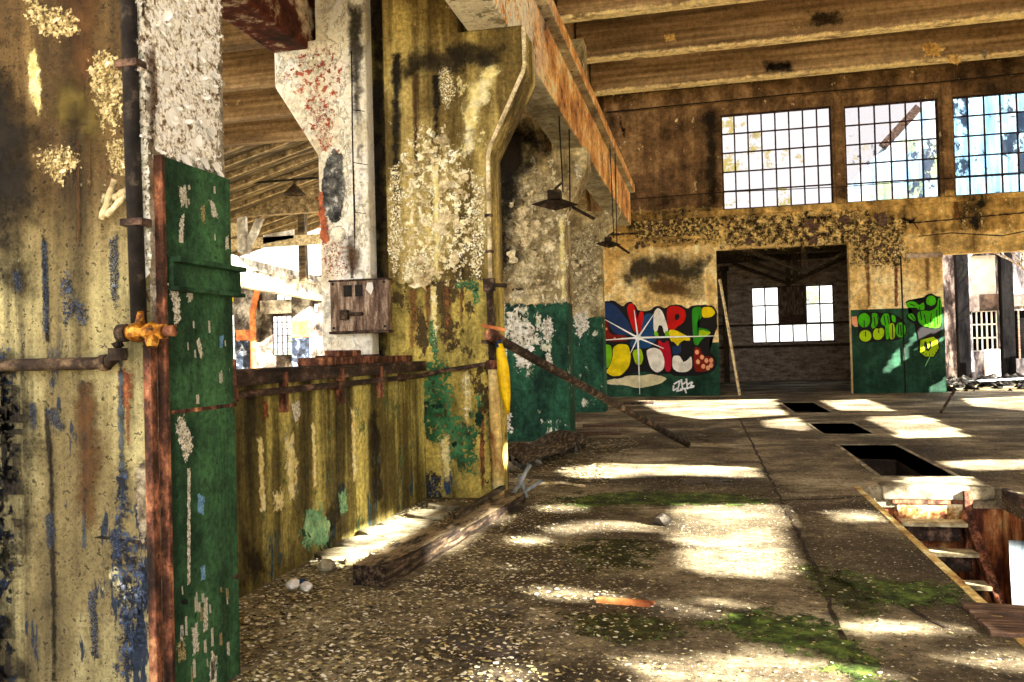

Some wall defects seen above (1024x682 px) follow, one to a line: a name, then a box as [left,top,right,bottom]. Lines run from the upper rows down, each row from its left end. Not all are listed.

peeling [135,0,226,277]
damp [348,0,506,278]
peeling [386,67,487,307]
damp [624,255,710,298]
peeling [503,161,912,373]
rust [117,368,133,446]
peeling [423,321,490,498]
peeling [175,417,230,682]
crack [739,418,949,679]